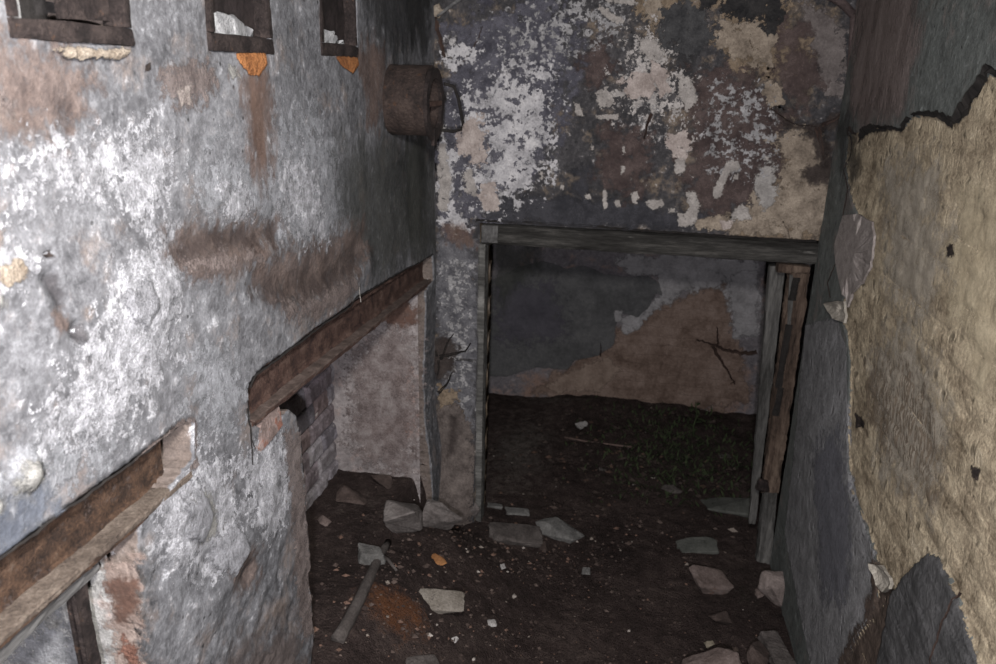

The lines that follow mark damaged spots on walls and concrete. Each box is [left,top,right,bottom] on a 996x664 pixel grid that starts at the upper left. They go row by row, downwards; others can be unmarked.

flaking render [100,549,149,664]
leakage [0,84,436,592]
peeling [337,0,850,525]
crack [696,327,757,384]
flaking render [824,76,996,664]